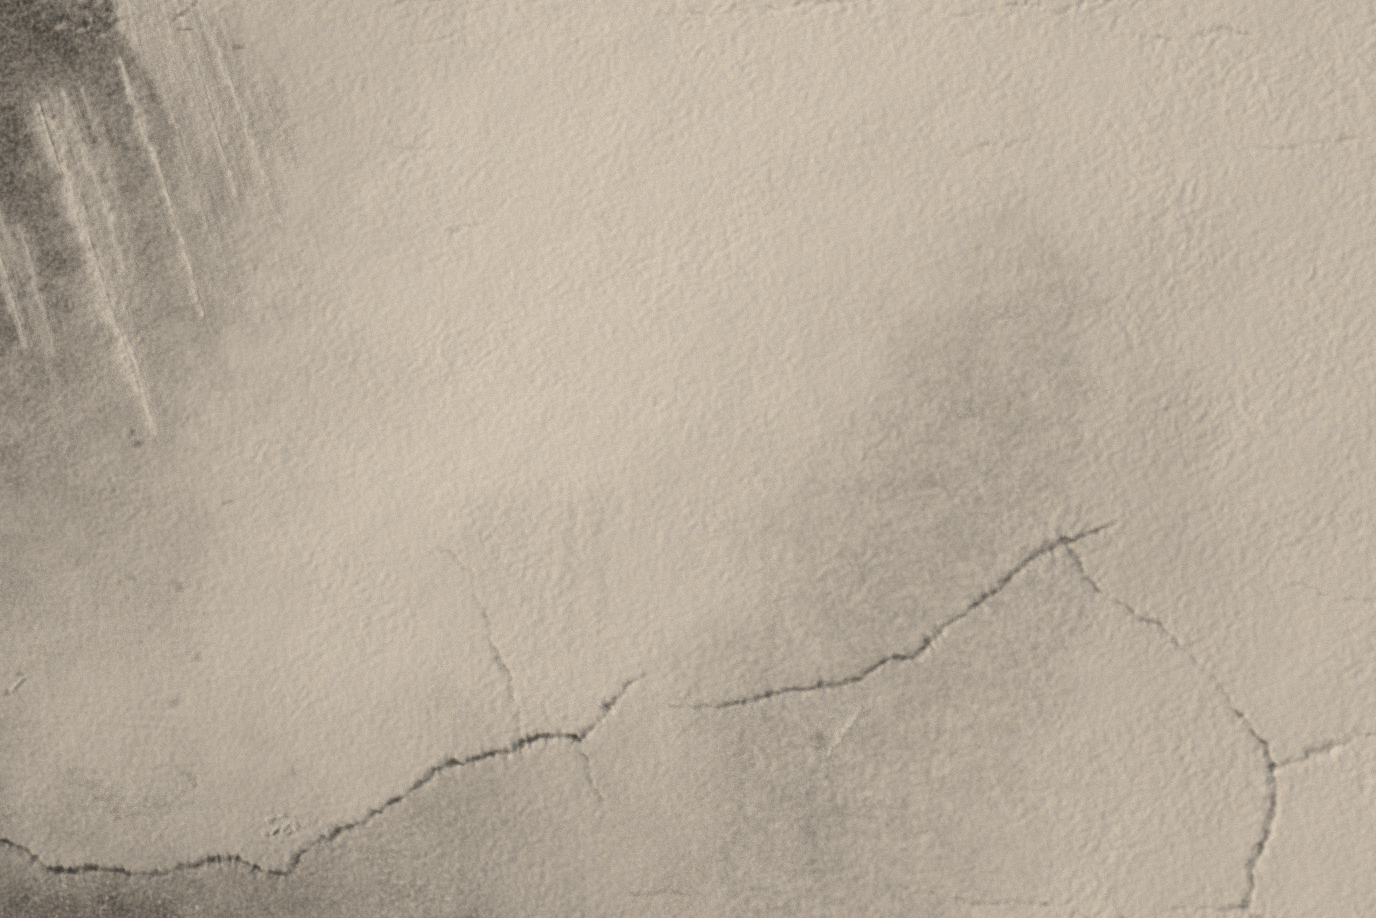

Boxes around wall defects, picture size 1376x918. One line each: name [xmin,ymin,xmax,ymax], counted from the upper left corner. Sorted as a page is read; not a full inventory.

leakage [0,0,277,439]
crack [433,735,580,770]
crack [0,840,130,875]